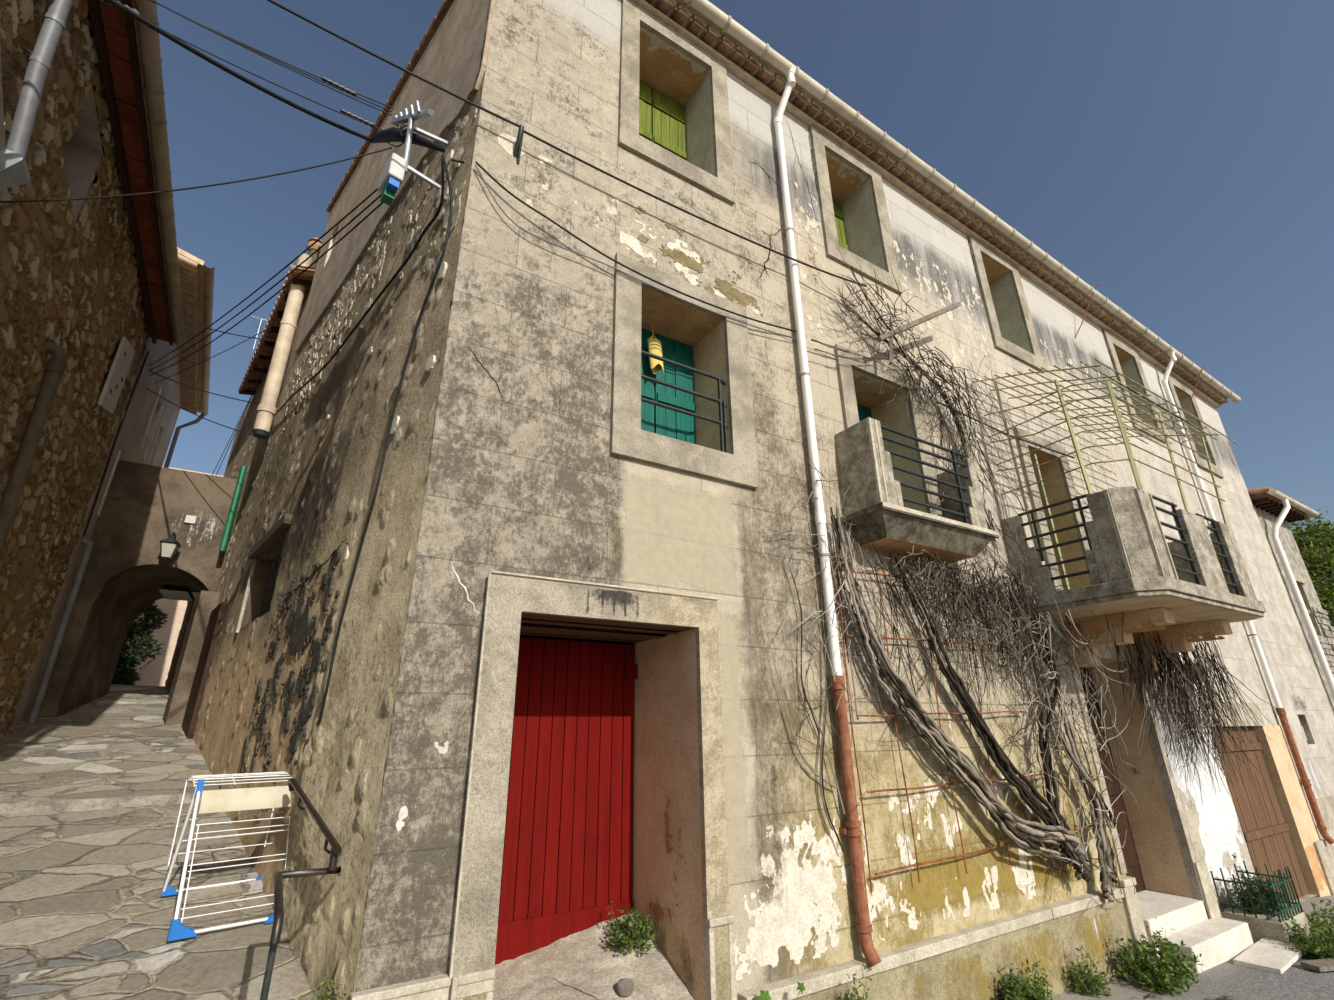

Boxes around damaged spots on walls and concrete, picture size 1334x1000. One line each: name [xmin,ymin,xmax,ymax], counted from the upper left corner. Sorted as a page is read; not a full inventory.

peeling [281,120,466,435]
peeling [588,198,727,299]
water stain [237,543,348,785]
peeling [734,812,848,980]
peeling [858,721,962,941]
peeling [943,839,1042,922]
peeling [990,774,1032,821]